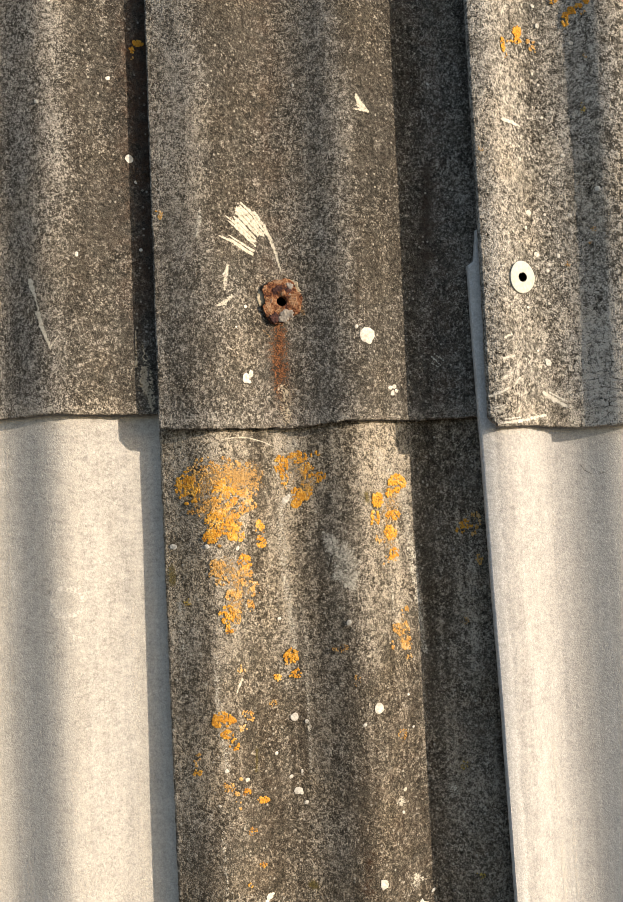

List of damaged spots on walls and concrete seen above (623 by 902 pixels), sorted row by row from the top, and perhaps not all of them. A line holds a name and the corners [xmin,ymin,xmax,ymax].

corrosion [264,325,292,424]